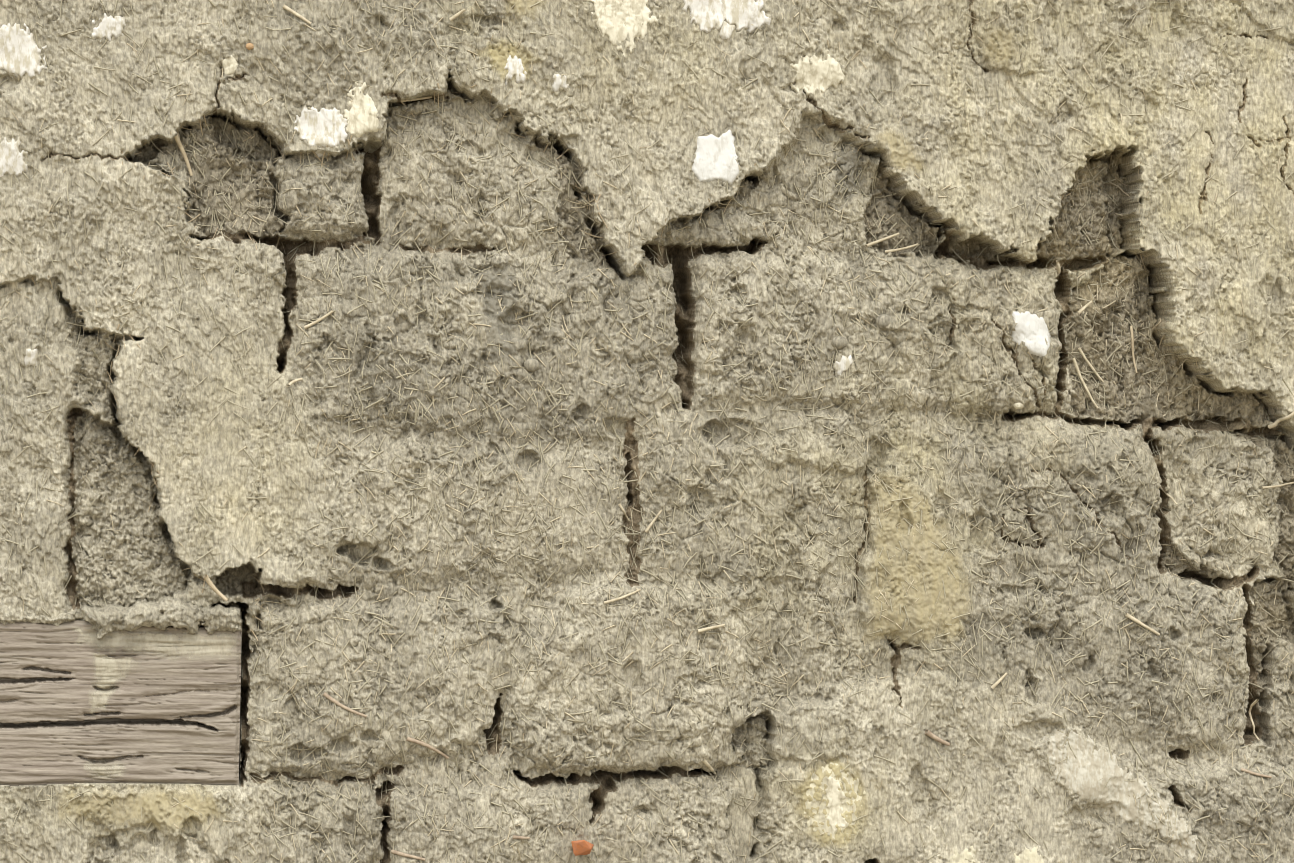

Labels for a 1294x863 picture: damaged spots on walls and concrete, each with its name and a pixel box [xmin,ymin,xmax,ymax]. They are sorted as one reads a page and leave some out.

spalling [128,114,292,241]
peeling [294,82,387,158]
spalling [528,133,623,275]
peeling [692,130,761,203]
crack [641,239,768,410]
peeling [832,355,853,377]
spalling [63,304,193,613]
spalling [864,147,1294,746]
spalling [215,564,263,598]